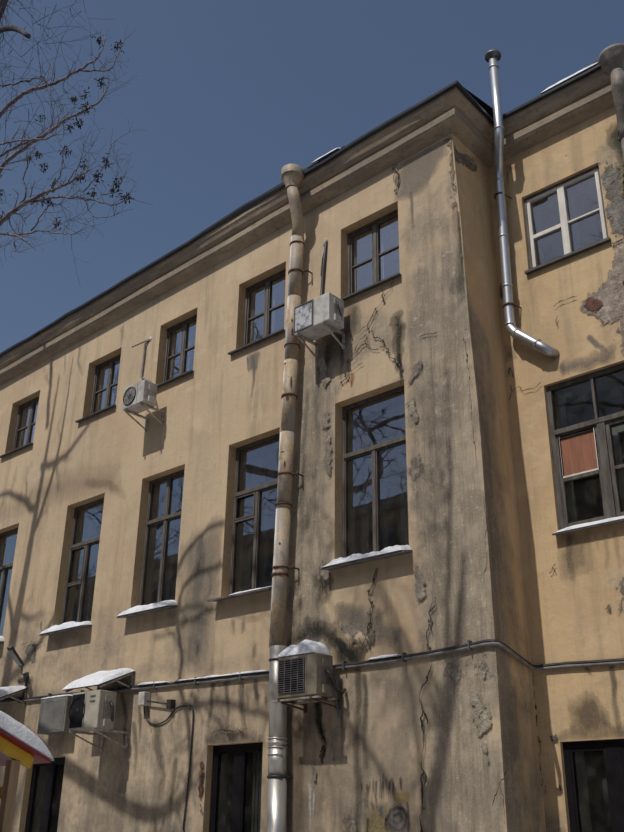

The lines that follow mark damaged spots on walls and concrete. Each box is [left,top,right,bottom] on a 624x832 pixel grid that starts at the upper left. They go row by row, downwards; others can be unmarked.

leakage [399,144,444,215]
spalling [580,161,624,356]
crack [334,282,403,400]
crack [362,568,378,653]
leakage [288,702,323,832]
leakage [291,605,400,789]
crack [419,599,436,832]